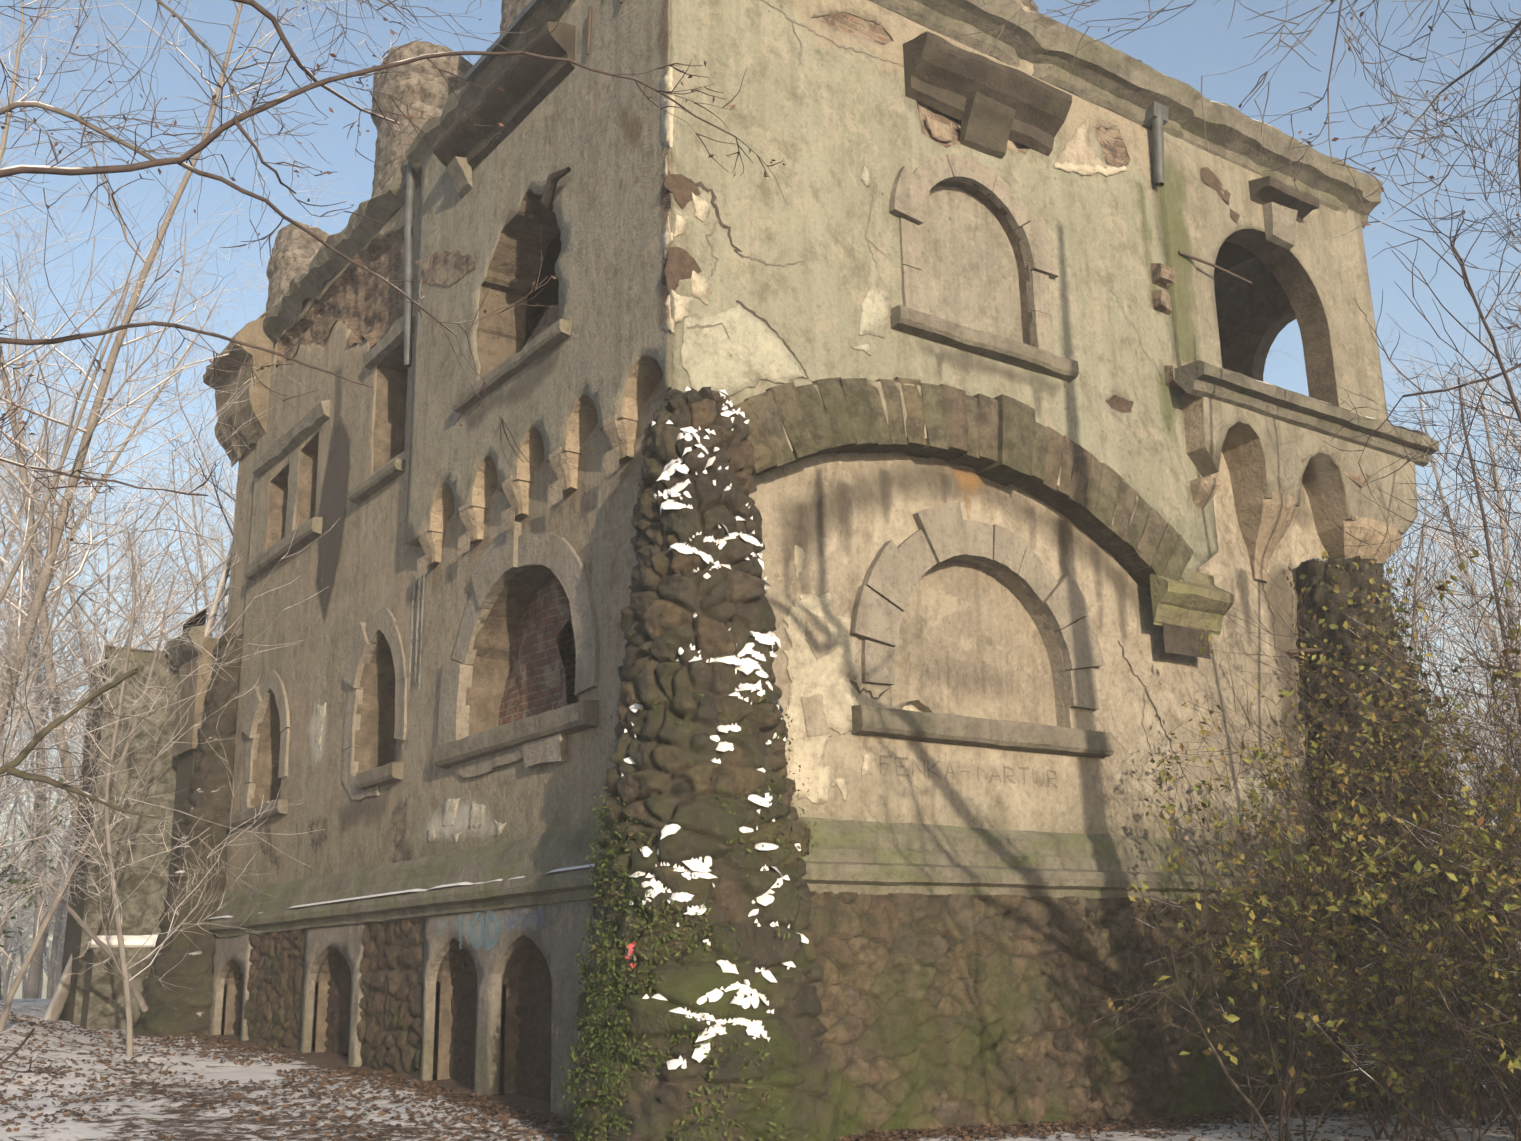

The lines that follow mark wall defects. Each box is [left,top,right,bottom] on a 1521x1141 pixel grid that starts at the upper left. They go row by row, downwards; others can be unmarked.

spalling [811,13,892,45]
peeling [1054,117,1130,177]
peeling [660,0,809,396]
crack [689,178,803,279]
spalling [276,214,476,367]
peeling [851,286,891,356]
peeling [310,702,326,764]
peeling [782,545,873,804]
crack [1118,640,1193,791]
peeling [426,798,506,843]